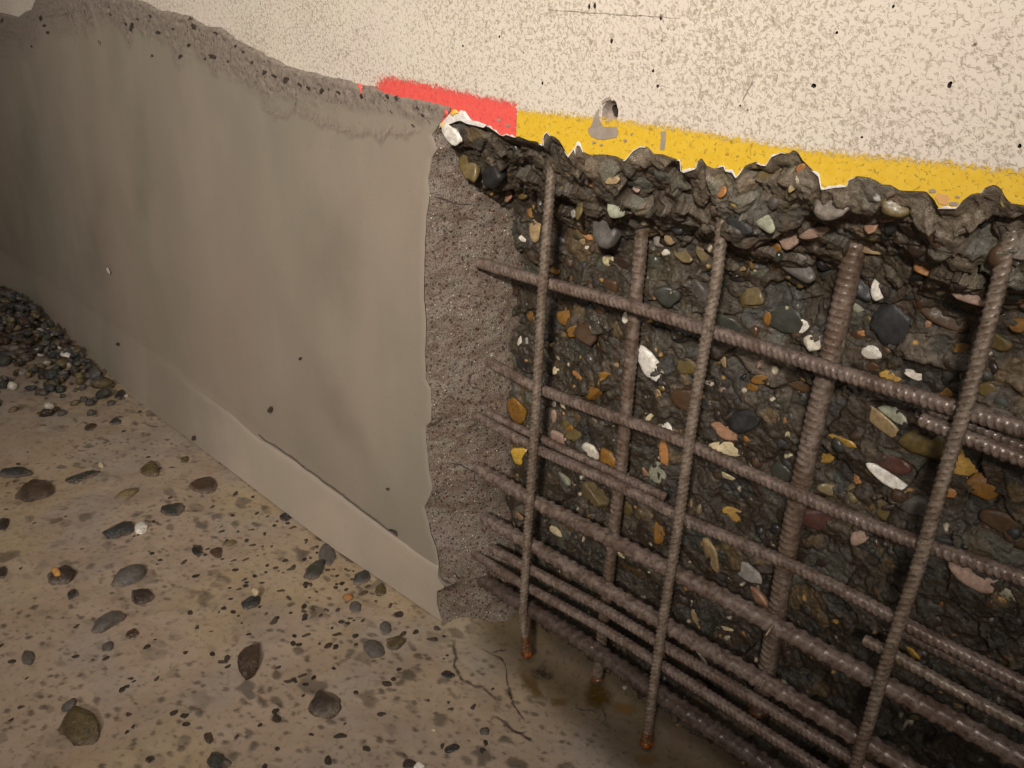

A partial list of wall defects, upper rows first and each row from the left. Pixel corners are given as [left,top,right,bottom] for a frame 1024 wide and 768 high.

crack [453,649,531,740]
spalling [434,97,1024,768]